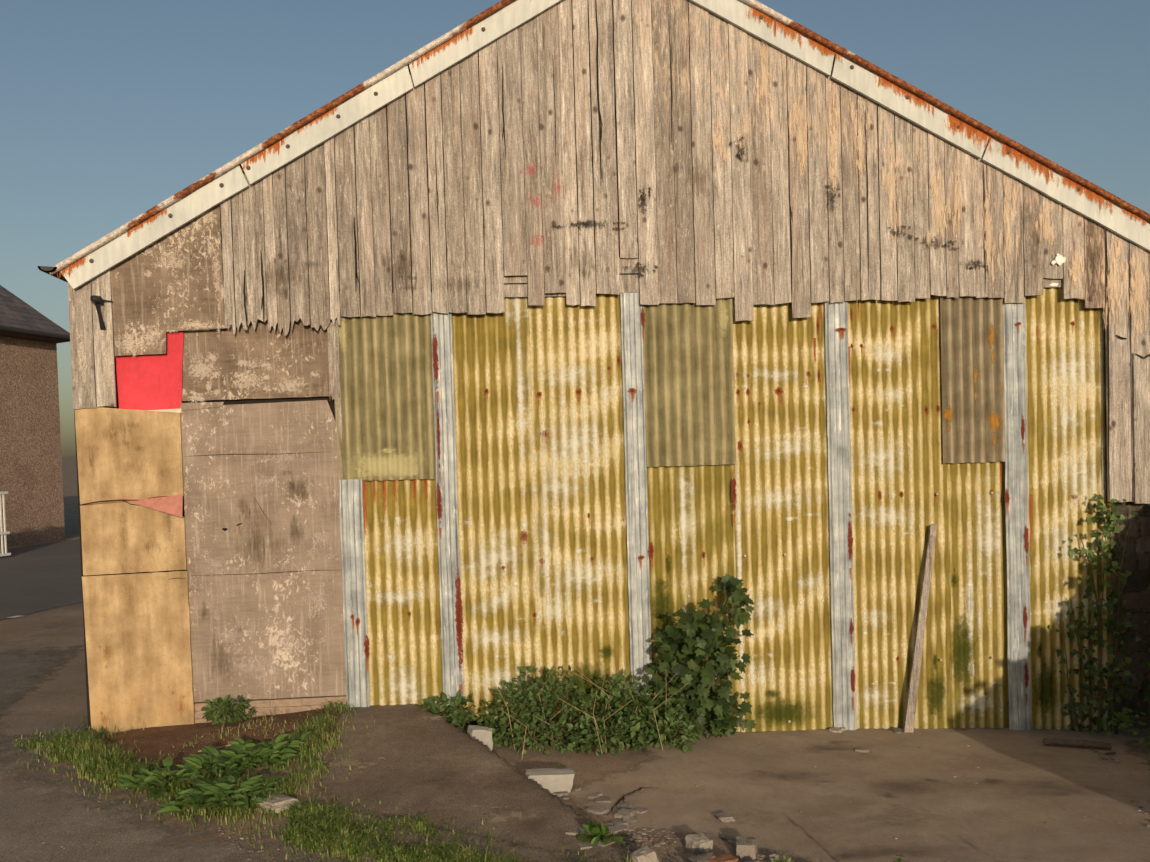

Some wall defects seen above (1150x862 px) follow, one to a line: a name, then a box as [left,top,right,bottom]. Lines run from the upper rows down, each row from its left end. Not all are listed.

corrosion [412,26,473,67]
corrosion [748,8,842,61]
corrosion [243,107,337,171]
corrosion [879,76,1146,225]
corrosion [127,208,166,237]
corrosion [59,257,85,277]
peeling [124,494,183,517]
corrosion [1024,494,1033,563]
corrosion [455,564,463,691]
water stain [568,647,611,702]
water stain [928,592,975,714]
water stain [756,691,804,723]